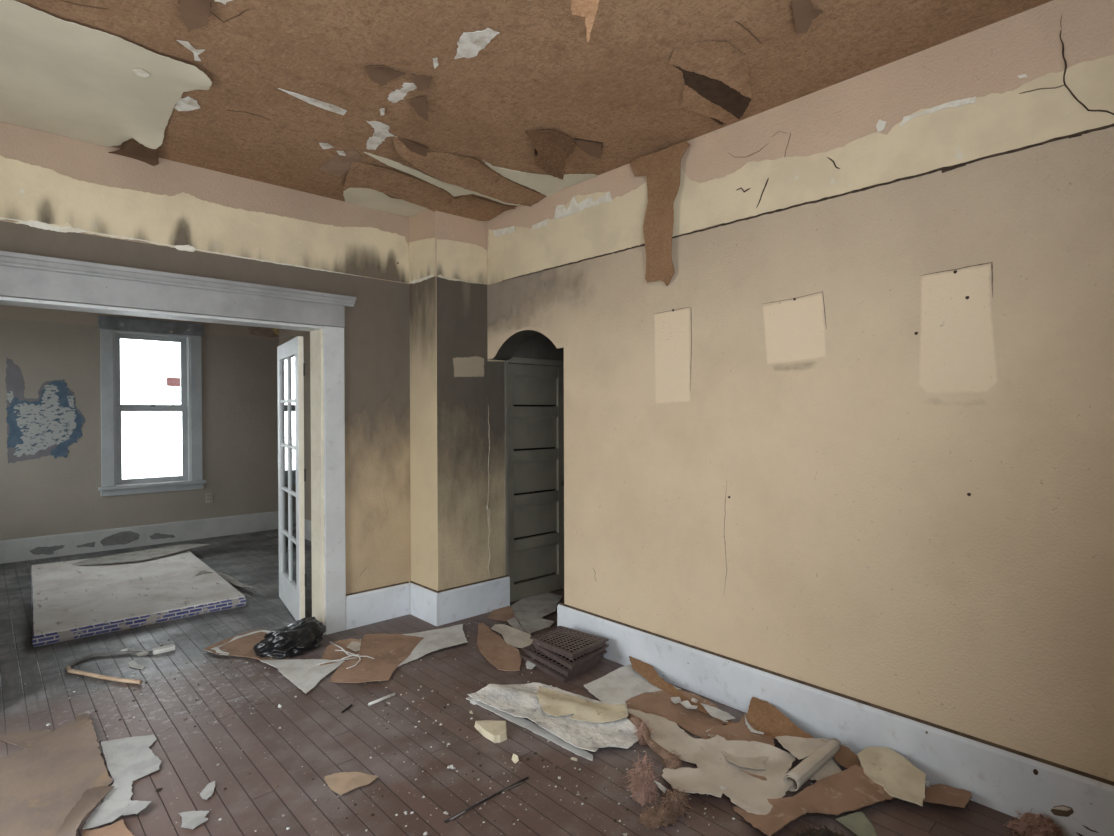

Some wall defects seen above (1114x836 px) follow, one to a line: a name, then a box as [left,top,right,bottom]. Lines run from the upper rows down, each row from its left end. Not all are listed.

flaking render [177,40,205,61]
flaking render [454,28,500,59]
flaking render [175,96,200,111]
flaking render [278,88,347,115]
flaking render [364,83,522,206]
crack [672,16,1114,238]
peeling [672,55,1114,237]
peeling [0,155,648,284]
crack [503,244,645,281]
peeling [5,357,85,464]
peeling [30,531,175,555]